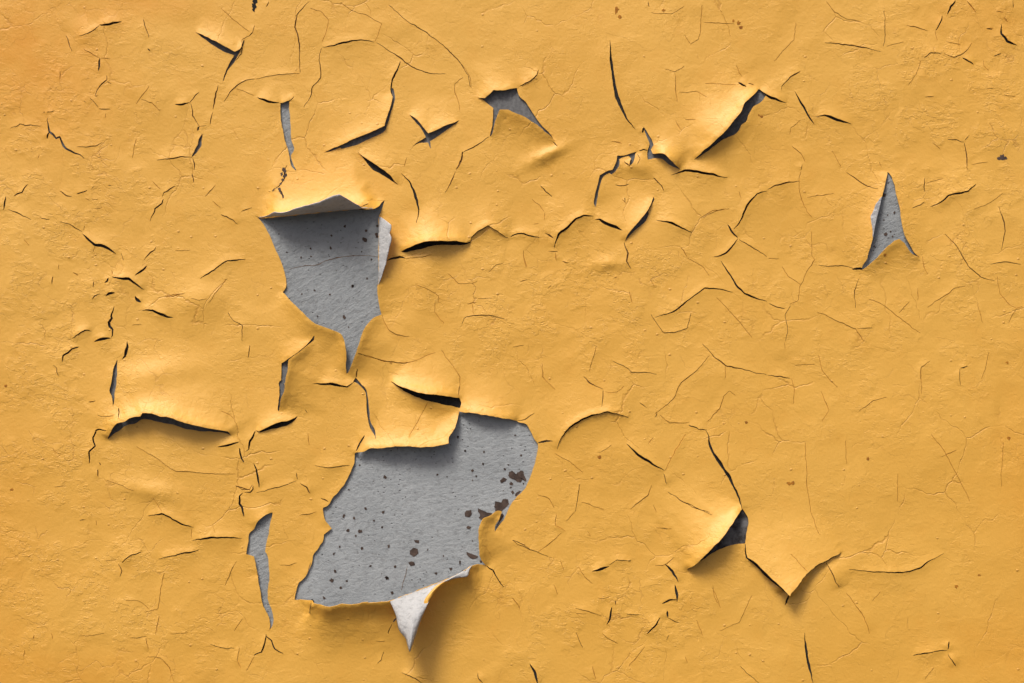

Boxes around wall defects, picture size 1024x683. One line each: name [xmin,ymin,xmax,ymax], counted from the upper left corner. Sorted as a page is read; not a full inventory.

crack [0,13,255,379]
crack [132,0,472,224]
peeling [84,83,538,652]
crack [288,252,433,270]
crack [314,314,460,397]
peeling [409,67,567,166]
crack [418,1,1021,683]
peeling [836,145,943,293]
crack [85,401,365,681]
crack [378,618,430,683]